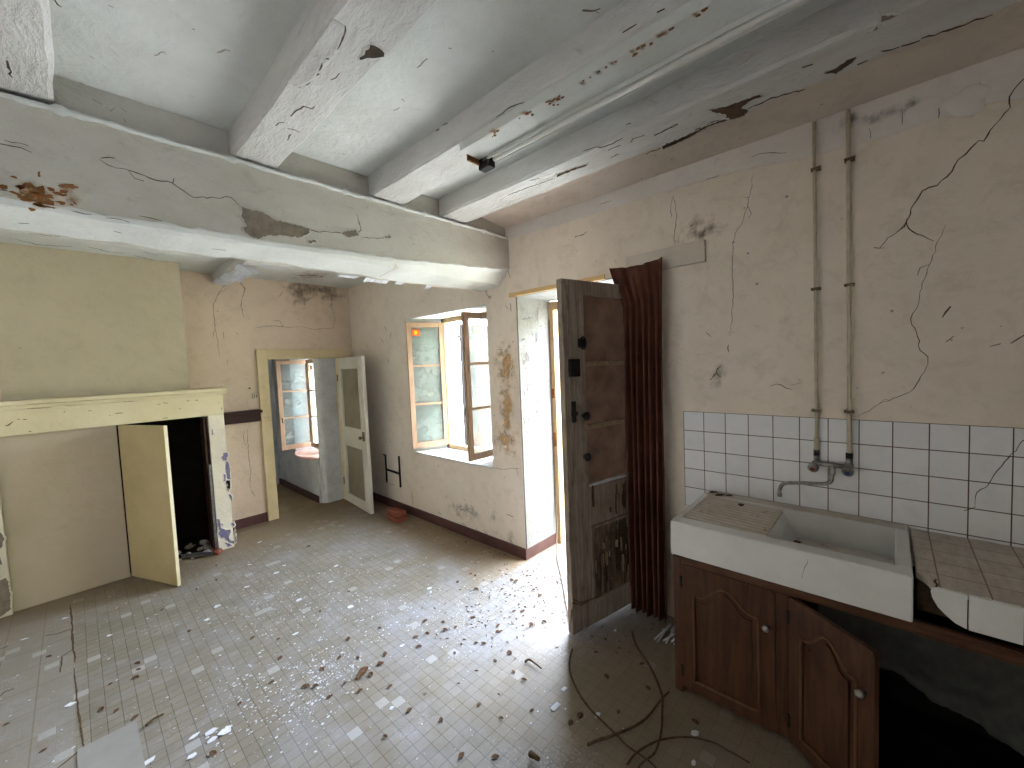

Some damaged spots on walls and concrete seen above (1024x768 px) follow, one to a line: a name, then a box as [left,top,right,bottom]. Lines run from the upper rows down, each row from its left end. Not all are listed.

spalling [357,41,388,61]
rust [0,171,78,212]
crack [99,157,239,205]
spalling [239,206,318,245]
crack [860,79,1024,415]
crack [213,282,335,350]
peeling [499,307,539,448]
peeling [219,451,233,502]
crack [964,440,1024,511]
peeling [216,518,237,548]
spalling [0,531,13,618]
crack [46,605,84,768]